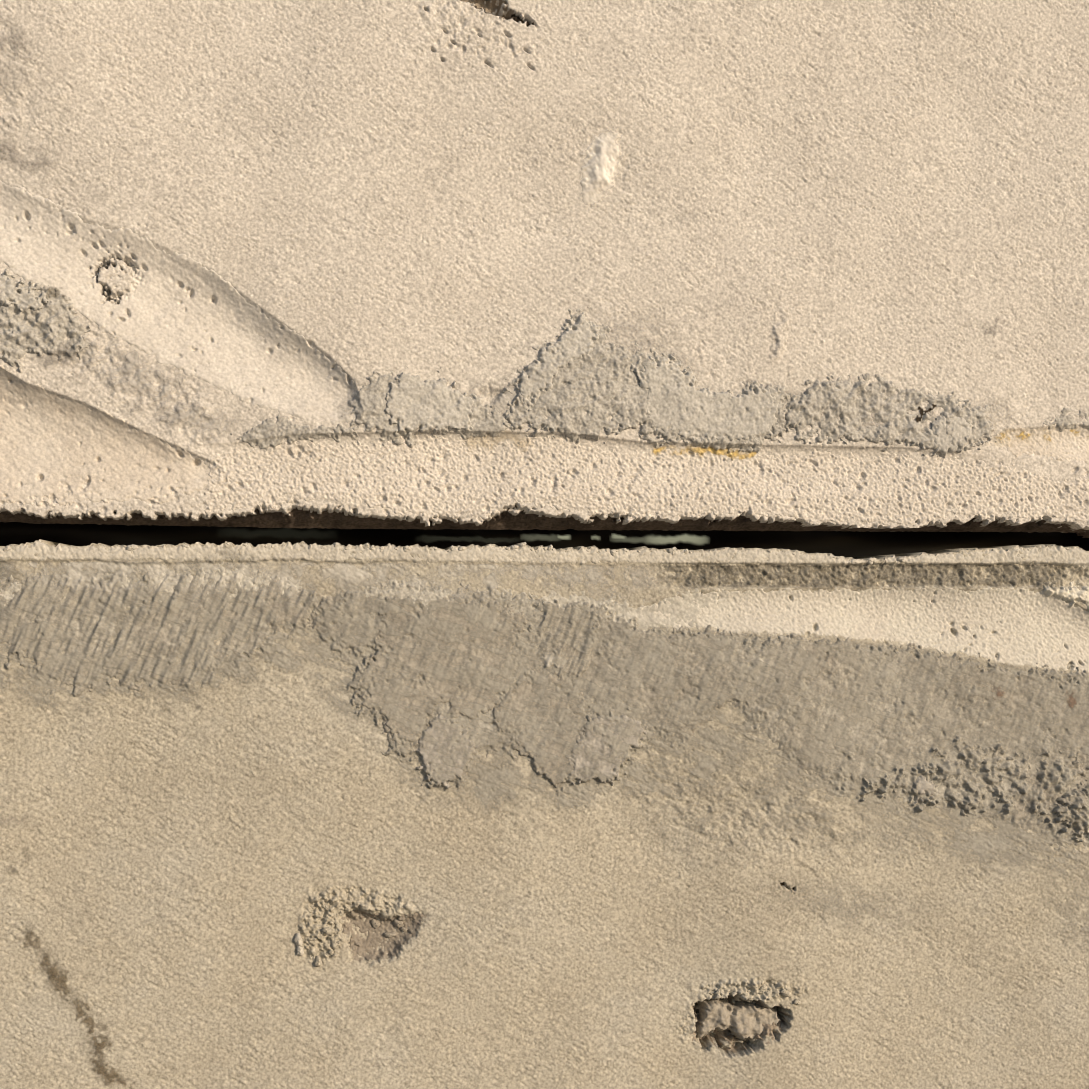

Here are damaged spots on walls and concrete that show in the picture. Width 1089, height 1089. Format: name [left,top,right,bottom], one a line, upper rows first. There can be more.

spalling [460,0,535,27]
peeling [516,310,602,411]
spalling [204,356,1089,532]
crack [0,522,1089,559]
spalling [0,540,1089,568]
spalling [1043,581,1089,609]
peeling [360,596,605,789]
peeling [566,709,647,786]
peeling [912,775,937,805]
spalling [294,901,427,967]
spalling [689,984,801,1054]